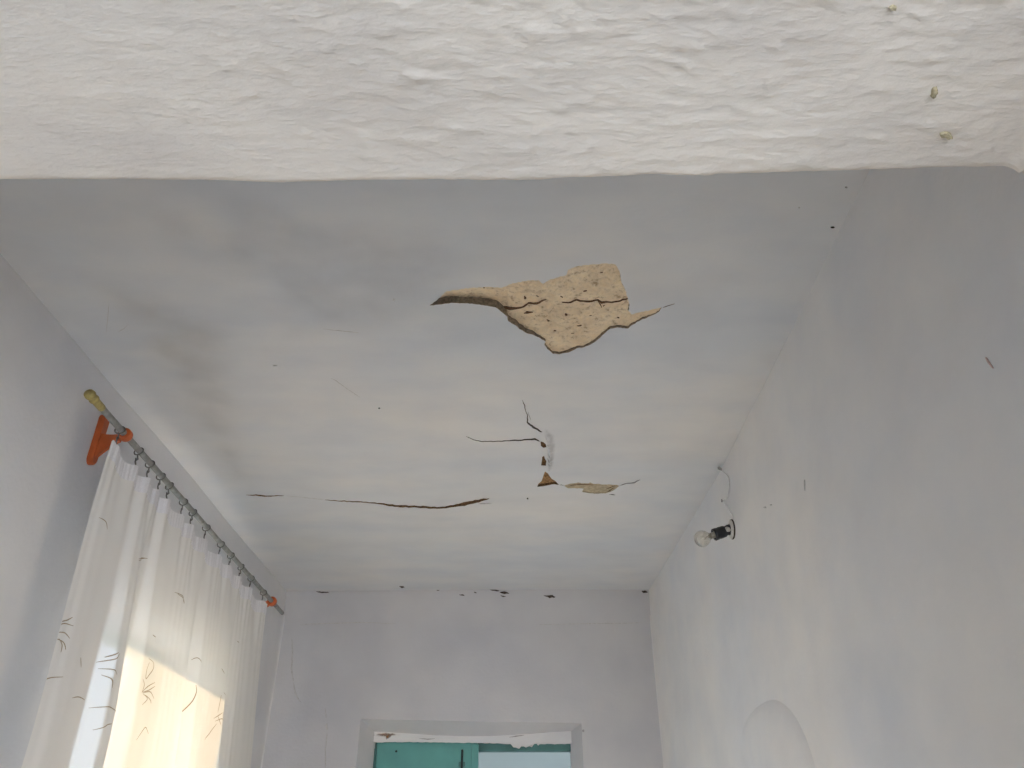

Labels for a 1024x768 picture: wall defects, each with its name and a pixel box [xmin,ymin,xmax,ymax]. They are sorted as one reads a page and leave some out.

flaking render [431,263,673,354]
crack [466,402,546,466]
crack [250,494,491,509]
peeling [537,472,639,495]